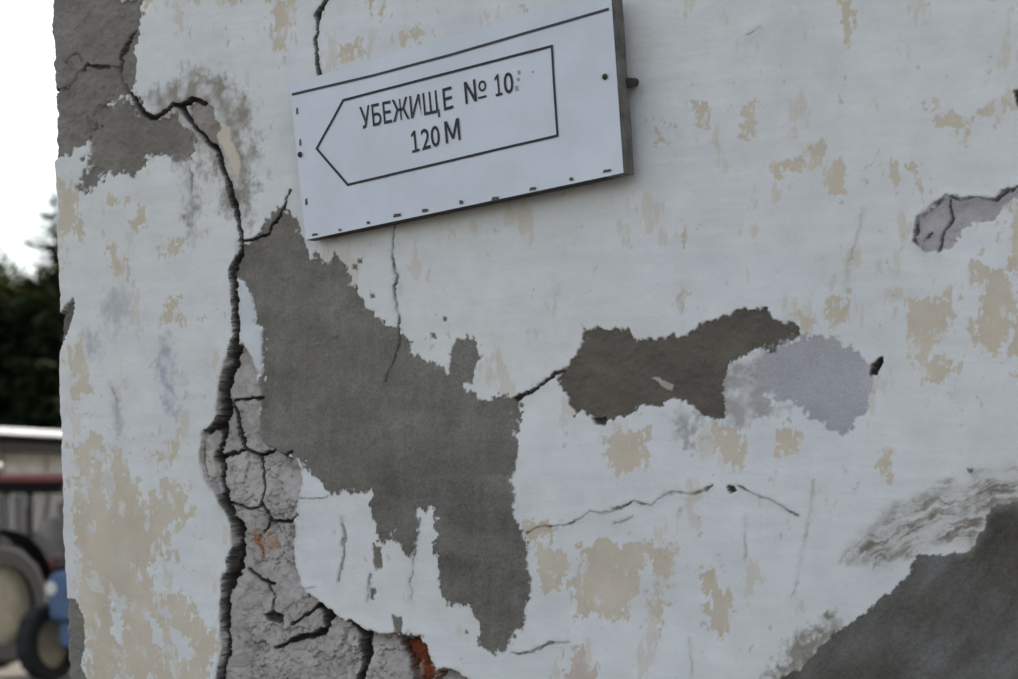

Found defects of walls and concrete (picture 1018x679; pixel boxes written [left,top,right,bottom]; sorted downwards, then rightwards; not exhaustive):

crack [316,2,326,75]
spalling [52,0,198,270]
crack [57,32,374,679]
crack [383,225,402,382]
flaking render [749,288,879,436]
peeling [883,161,1018,386]
spalling [61,283,421,679]
crack [409,530,419,603]
crack [527,485,713,533]
peeling [601,423,652,486]
peeling [522,517,736,641]
crack [738,480,815,598]